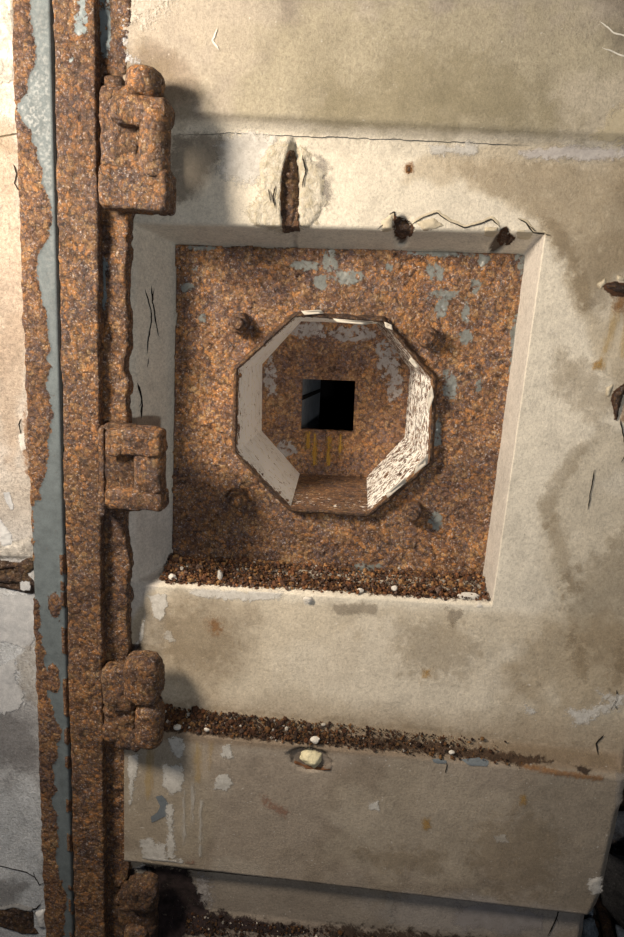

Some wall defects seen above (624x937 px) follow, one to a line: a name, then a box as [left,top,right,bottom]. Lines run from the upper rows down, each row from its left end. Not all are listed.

water stain [122,0,181,65]
spalling [246,141,329,236]
crack [378,210,551,236]
spalling [289,736,332,771]